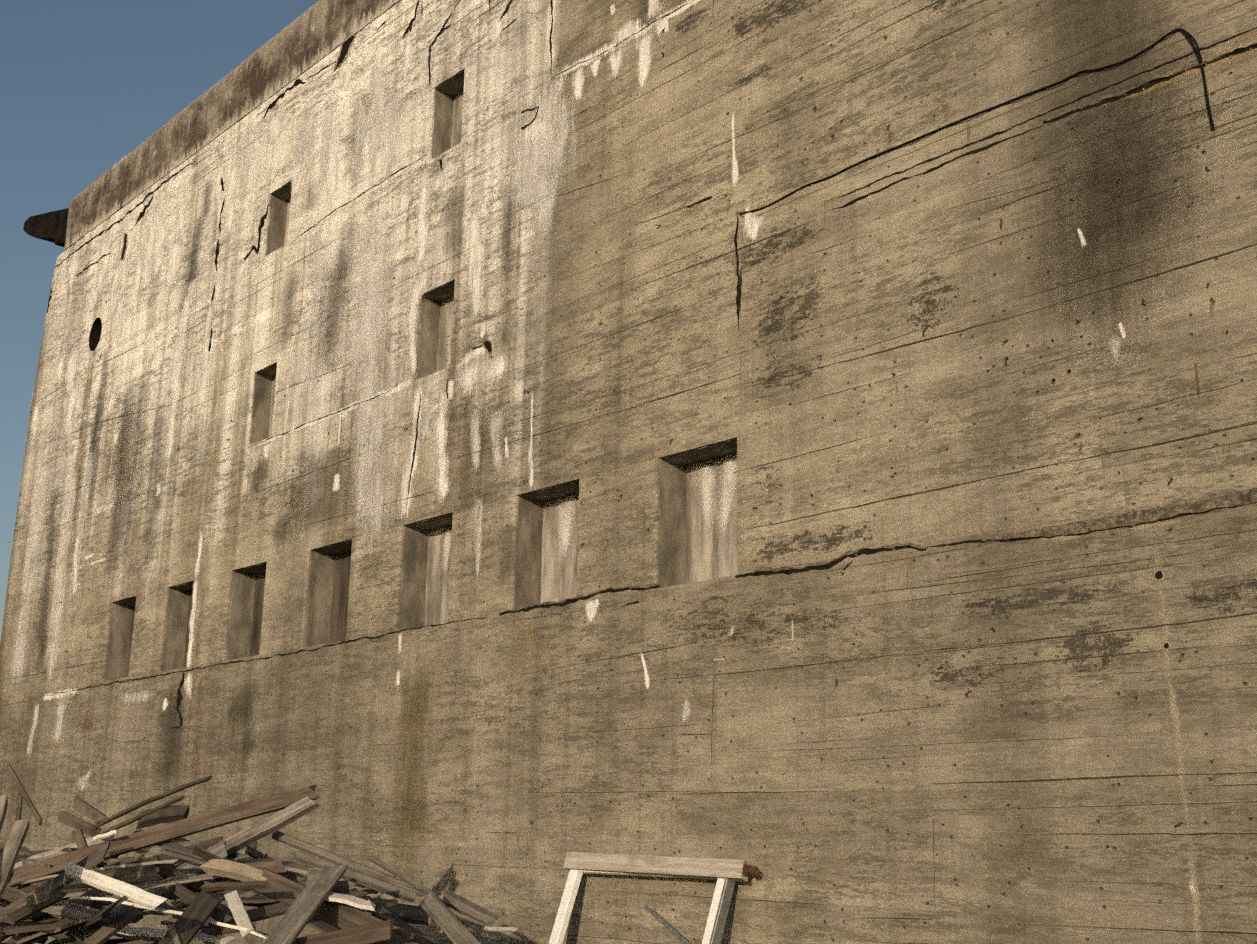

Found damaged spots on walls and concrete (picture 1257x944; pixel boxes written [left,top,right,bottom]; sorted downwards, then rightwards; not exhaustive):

crack [263,60,337,118]
water stain [647,0,661,19]
water stain [729,65,771,88]
water stain [725,0,821,39]
crack [826,27,1257,210]
crack [47,158,197,313]
water stain [57,171,213,459]
crack [208,178,269,352]
water stain [399,173,489,518]
efflorescence [471,413,509,470]
crack [735,539,1017,578]
crack [45,583,659,728]